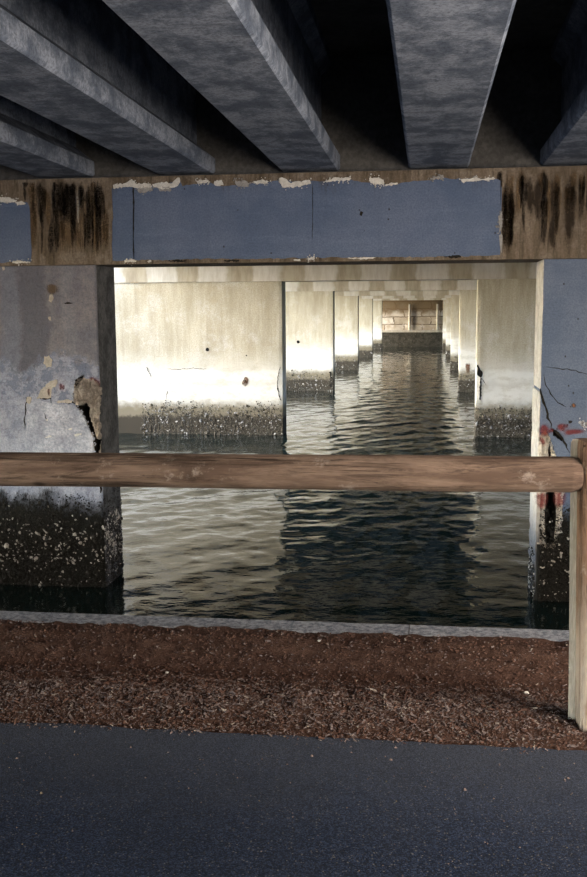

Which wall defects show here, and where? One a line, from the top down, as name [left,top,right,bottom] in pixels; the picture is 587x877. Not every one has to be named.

peeling [113,177,180,195]
peeling [195,177,312,189]
peeling [365,174,398,188]
peeling [459,175,495,183]
water stain [22,181,109,252]
water stain [497,172,587,249]
crack [477,365,485,400]
peeling [25,375,102,453]
crack [540,367,586,453]